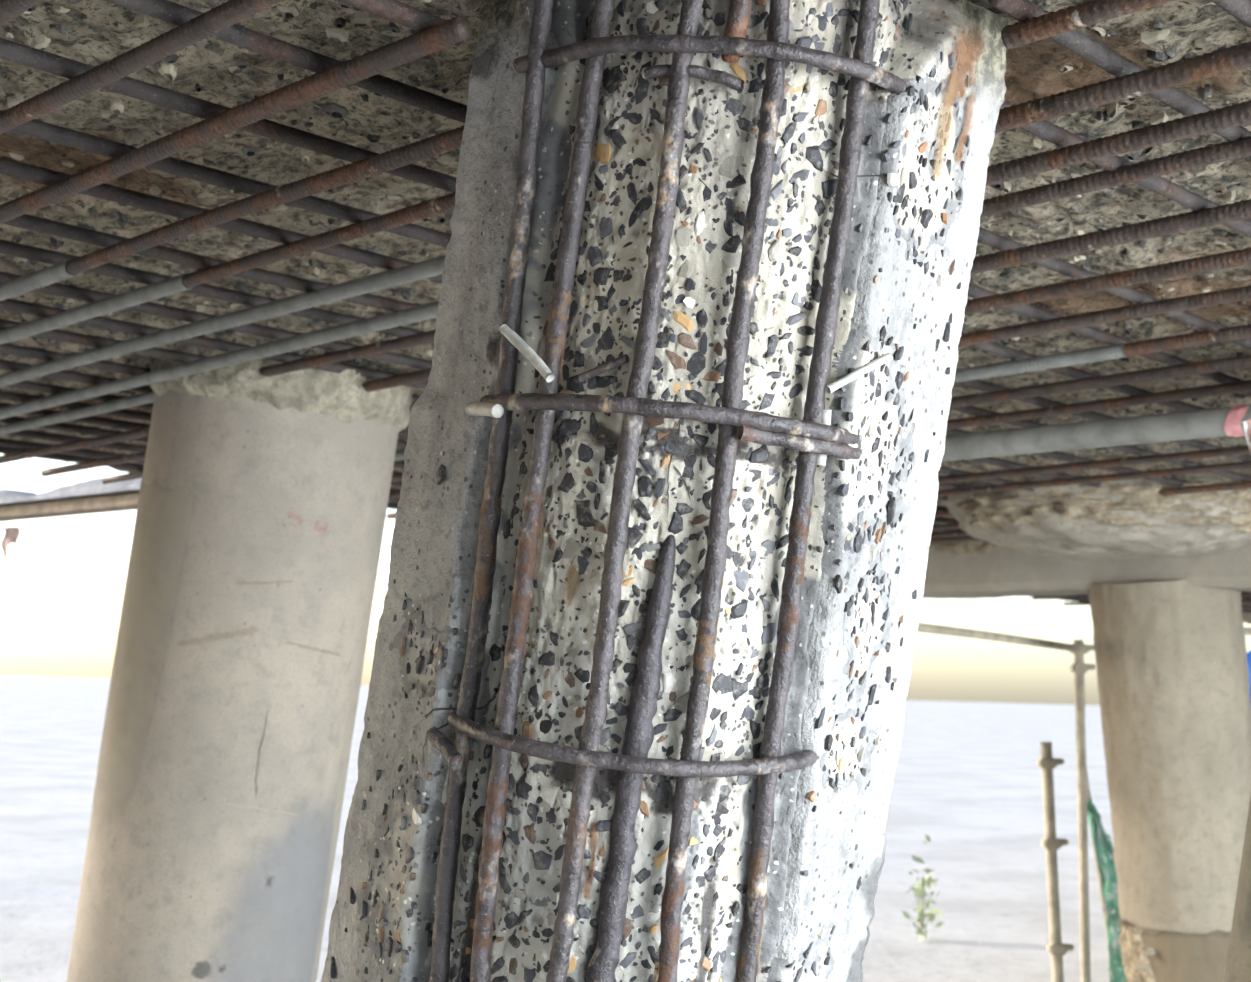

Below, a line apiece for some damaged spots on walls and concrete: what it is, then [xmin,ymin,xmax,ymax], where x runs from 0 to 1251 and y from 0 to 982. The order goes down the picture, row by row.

spalling [32,4,70,51]
spalling [325,2,411,42]
spalling [1090,27,1118,37]
spalling [1127,21,1226,62]
spalling [158,54,178,92]
spalling [98,88,163,147]
spalling [1097,96,1168,129]
spalling [1214,182,1251,205]
spalling [1016,195,1147,238]
spalling [1056,227,1250,281]
spalling [1153,274,1251,320]
spalling [928,530,1010,556]